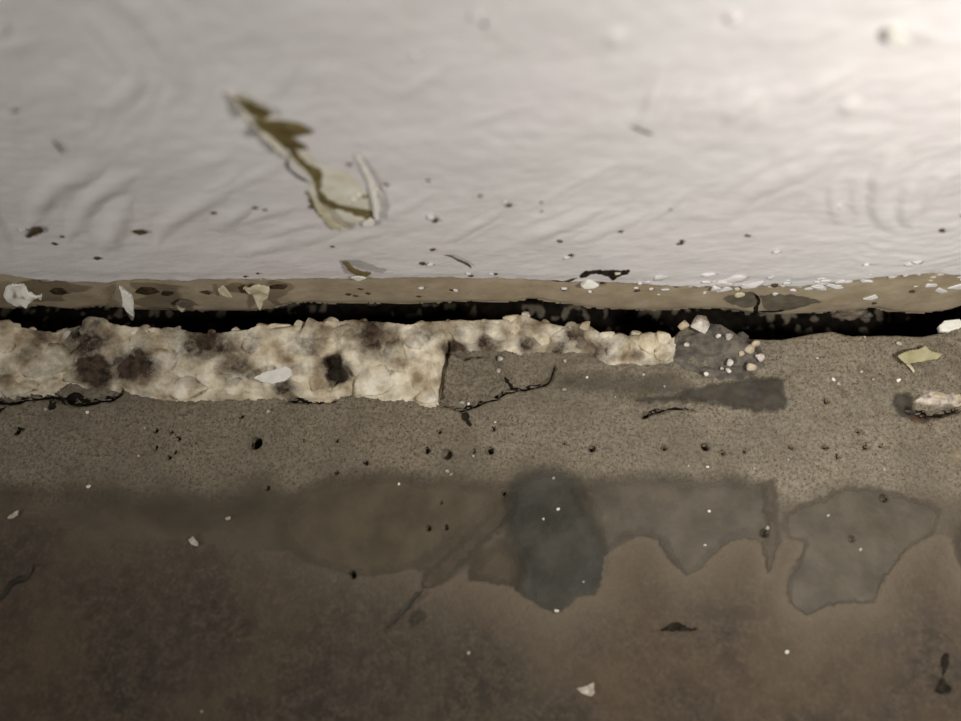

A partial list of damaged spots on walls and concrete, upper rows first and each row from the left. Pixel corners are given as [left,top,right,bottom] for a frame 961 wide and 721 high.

peeling [227,92,389,232]
crack [0,294,961,340]
spalling [0,260,961,408]
crack [0,562,46,600]
leakage [281,471,939,615]